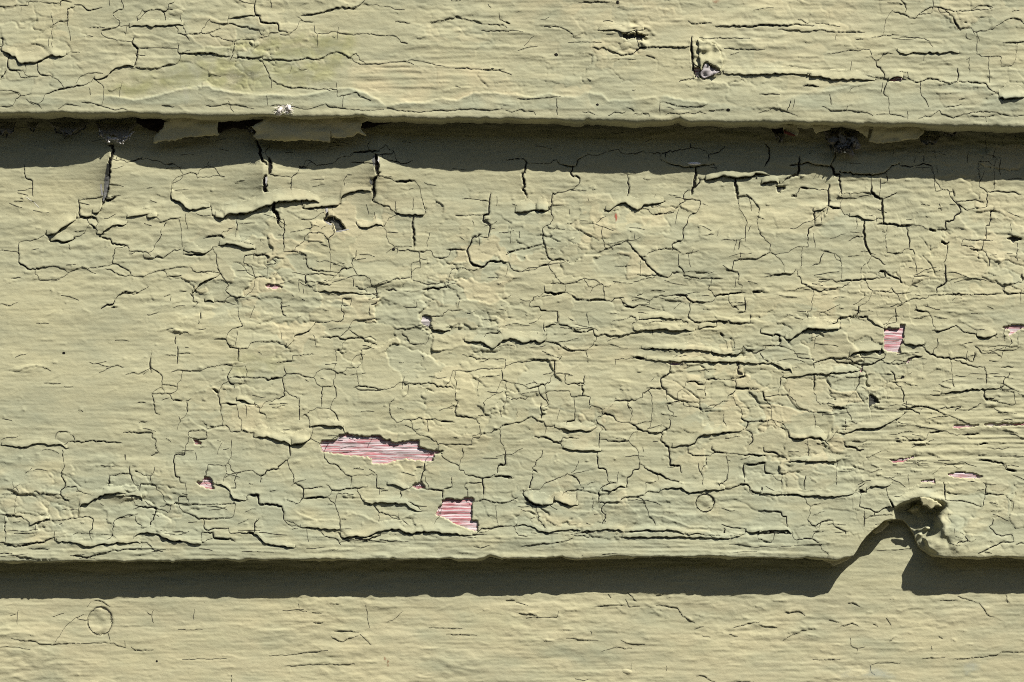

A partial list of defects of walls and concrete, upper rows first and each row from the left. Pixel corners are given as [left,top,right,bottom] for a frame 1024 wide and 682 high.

crack [0,0,559,128]
crack [546,0,1024,122]
peeling [136,116,389,143]
crack [585,102,722,129]
crack [0,133,1024,559]
spalling [875,325,911,363]
spalling [320,433,440,464]
spalling [197,477,214,489]
spalling [436,498,478,531]
crack [269,609,399,666]